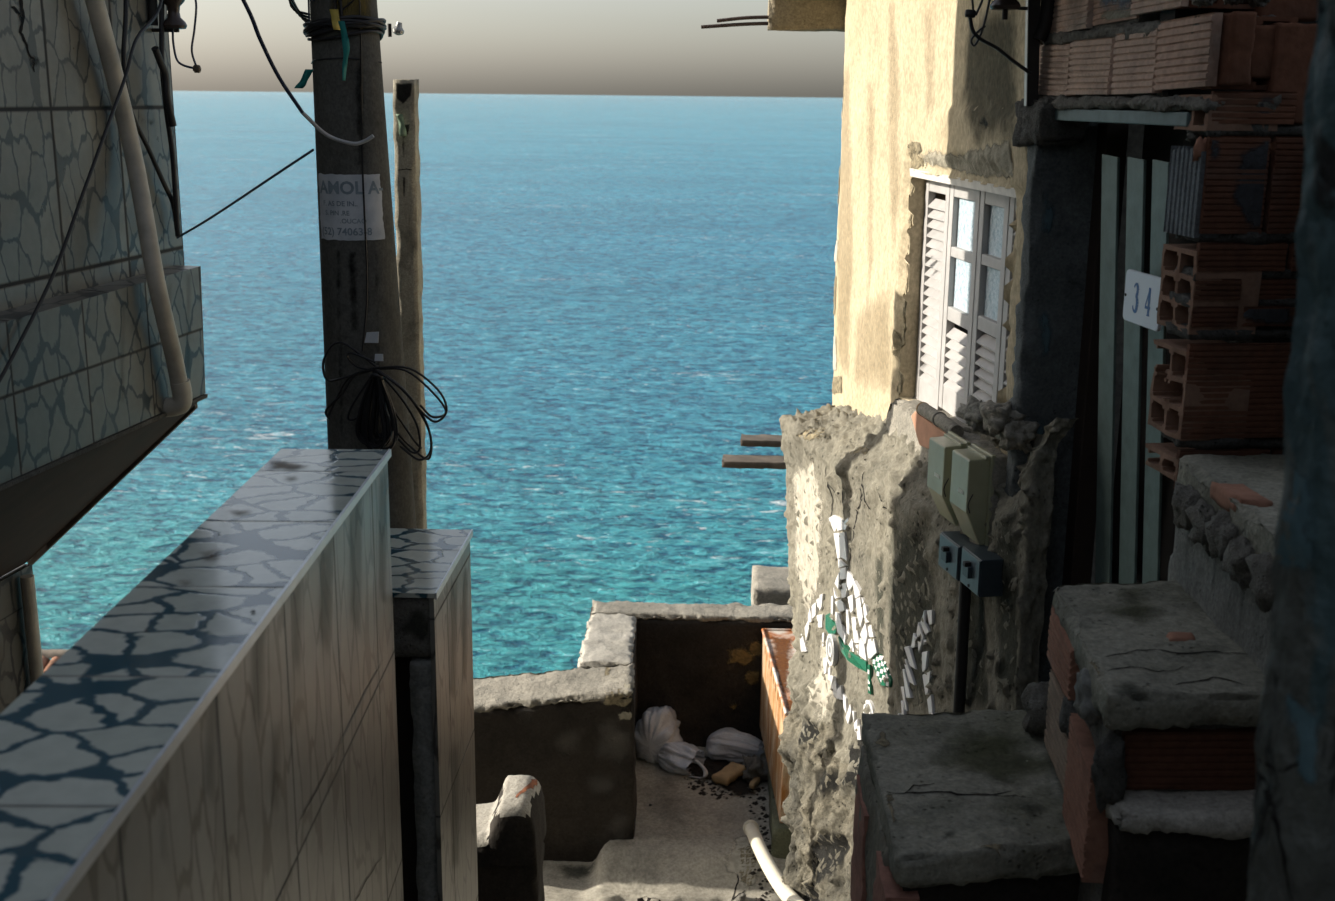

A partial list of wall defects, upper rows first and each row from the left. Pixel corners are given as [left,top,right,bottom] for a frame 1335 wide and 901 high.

crack [12,0,38,72]
crack [1105,649,1245,685]
crack [887,783,1032,798]